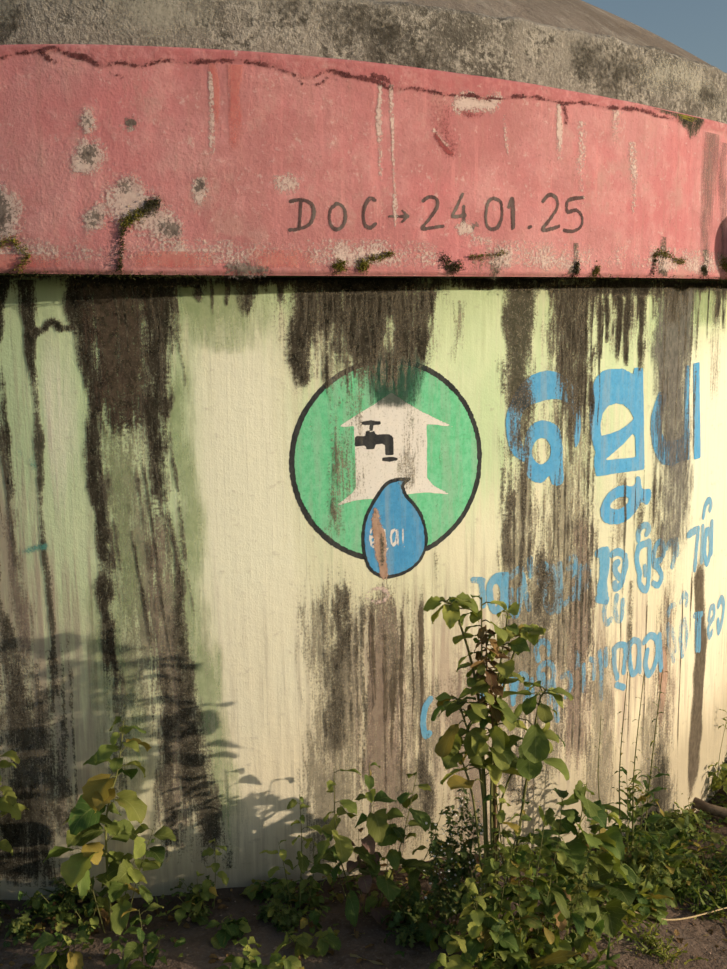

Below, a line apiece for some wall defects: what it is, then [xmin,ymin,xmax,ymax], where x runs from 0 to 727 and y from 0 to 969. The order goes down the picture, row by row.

peeling [70,107,108,175]
leakage [208,63,242,153]
leakage [375,84,398,226]
leakage [656,108,704,138]
peeling [0,184,26,240]
peeling [82,175,209,268]
leakage [0,133,727,887]